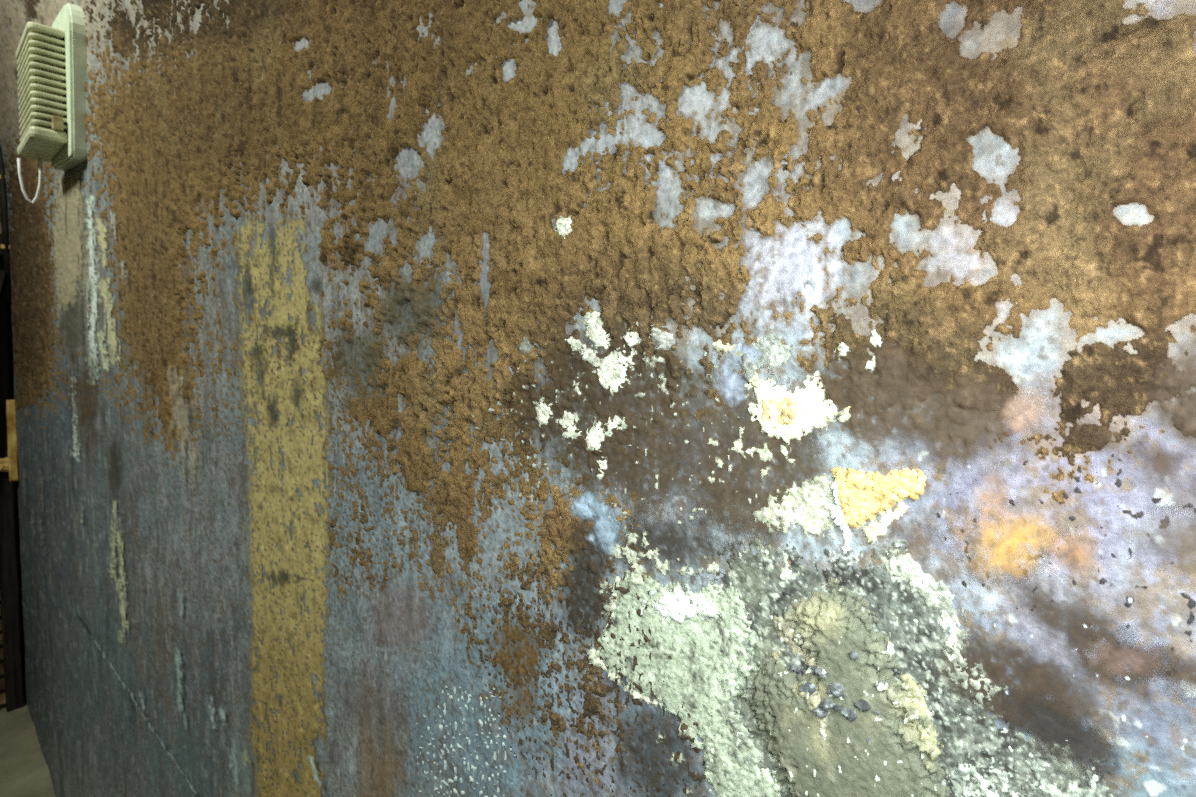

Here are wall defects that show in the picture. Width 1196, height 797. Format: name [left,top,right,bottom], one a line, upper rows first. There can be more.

rust [740,318,757,348]
rust [698,343,727,413]
rust [797,352,820,386]
rust [599,476,644,543]
rust [1044,489,1067,503]
rust [1050,467,1075,481]
rust [417,575,434,601]
water stain [472,321,819,797]
rust [555,615,634,764]
water stain [864,541,1196,797]